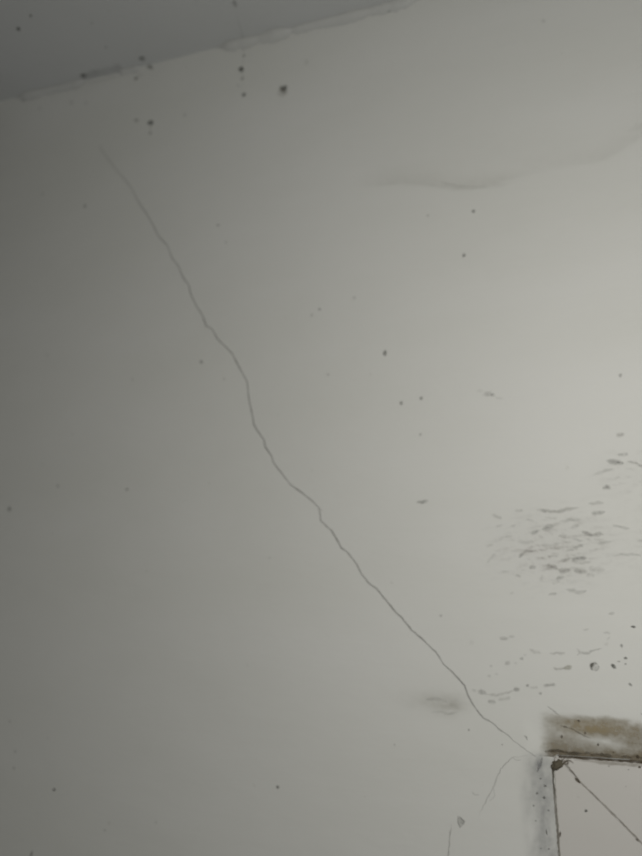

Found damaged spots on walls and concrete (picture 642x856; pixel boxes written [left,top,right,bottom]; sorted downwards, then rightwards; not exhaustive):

damp [548,719,642,761]